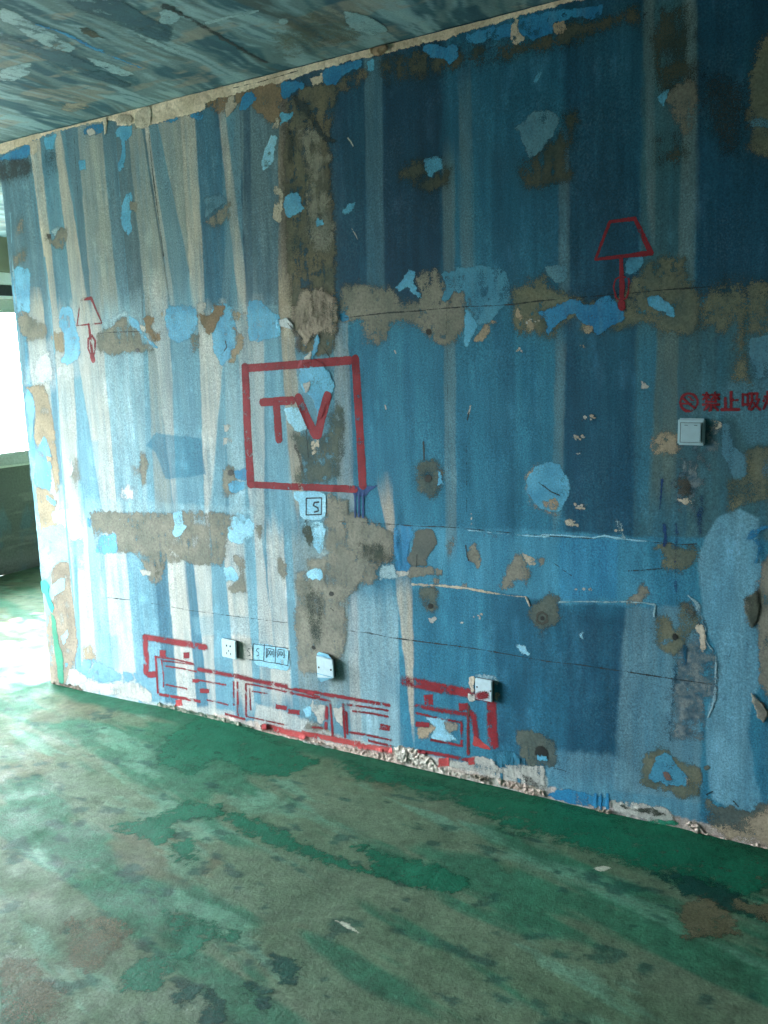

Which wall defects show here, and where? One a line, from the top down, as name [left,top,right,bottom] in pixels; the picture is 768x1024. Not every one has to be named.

peeling [11,249,768,923]
flaking render [96,0,703,677]
crack [345,287,702,318]
crack [353,631,712,685]